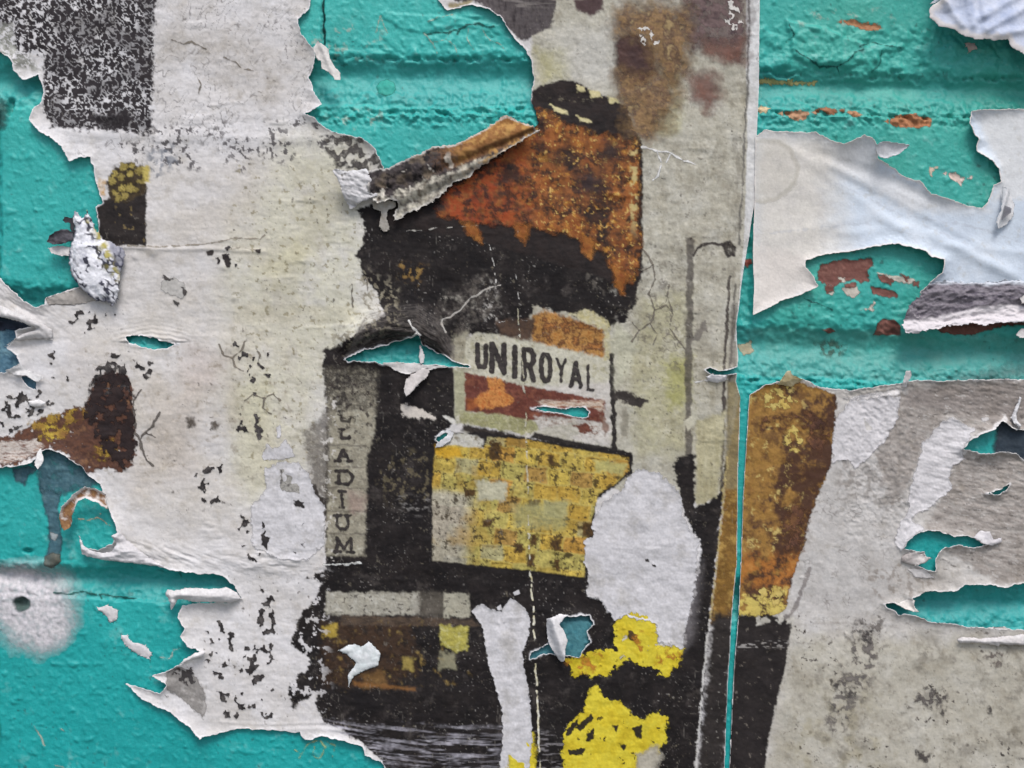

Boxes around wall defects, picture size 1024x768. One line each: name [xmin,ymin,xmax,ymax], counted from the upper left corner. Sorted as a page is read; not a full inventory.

peeling [758,106,861,121]
peeling [885,113,932,128]
peeling [929,166,972,186]
peeling [817,258,919,336]
peeling [938,322,1024,335]
peeling [195,464,223,504]
peeling [894,417,989,551]
peeling [908,568,935,578]
spalling [14,597,30,612]